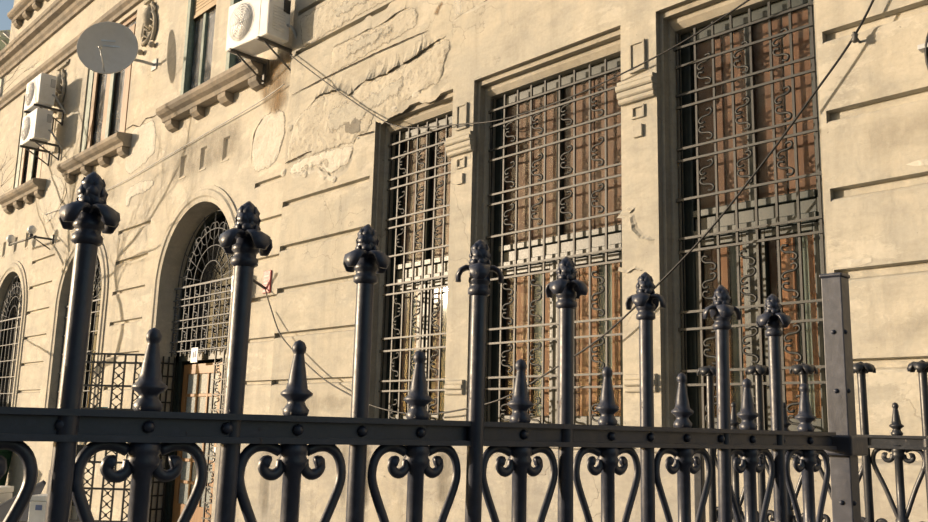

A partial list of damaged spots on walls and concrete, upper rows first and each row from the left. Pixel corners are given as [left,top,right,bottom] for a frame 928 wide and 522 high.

spalling [300,0,418,73]
spalling [125,120,156,174]
spalling [250,105,285,172]
spalling [280,146,353,183]
spalling [39,174,64,223]
peeling [617,206,655,244]